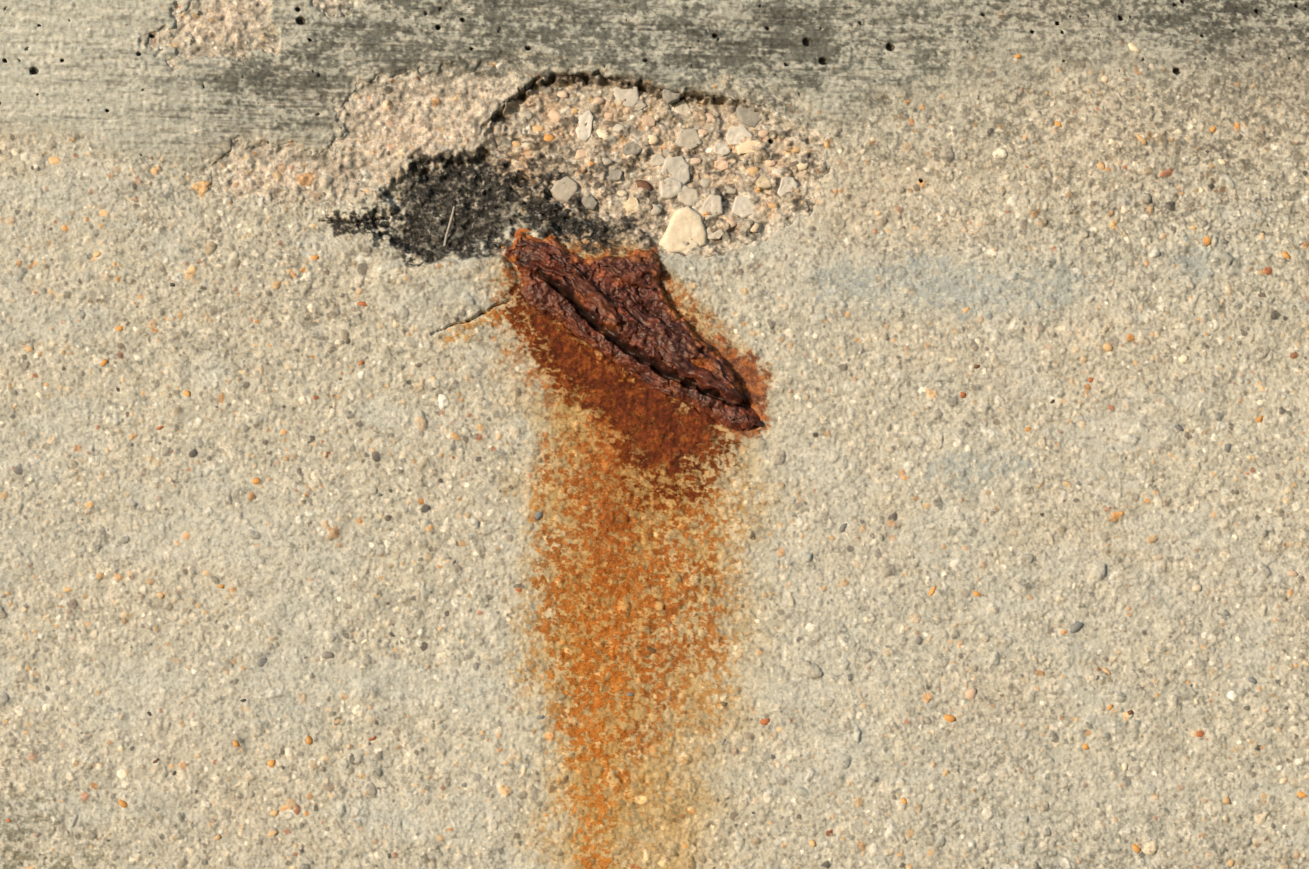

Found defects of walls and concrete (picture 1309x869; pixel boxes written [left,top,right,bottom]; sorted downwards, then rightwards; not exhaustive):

peeling [147,0,281,71]
water stain [326,148,652,266]
spalling [205,62,830,258]
rust [446,228,772,869]